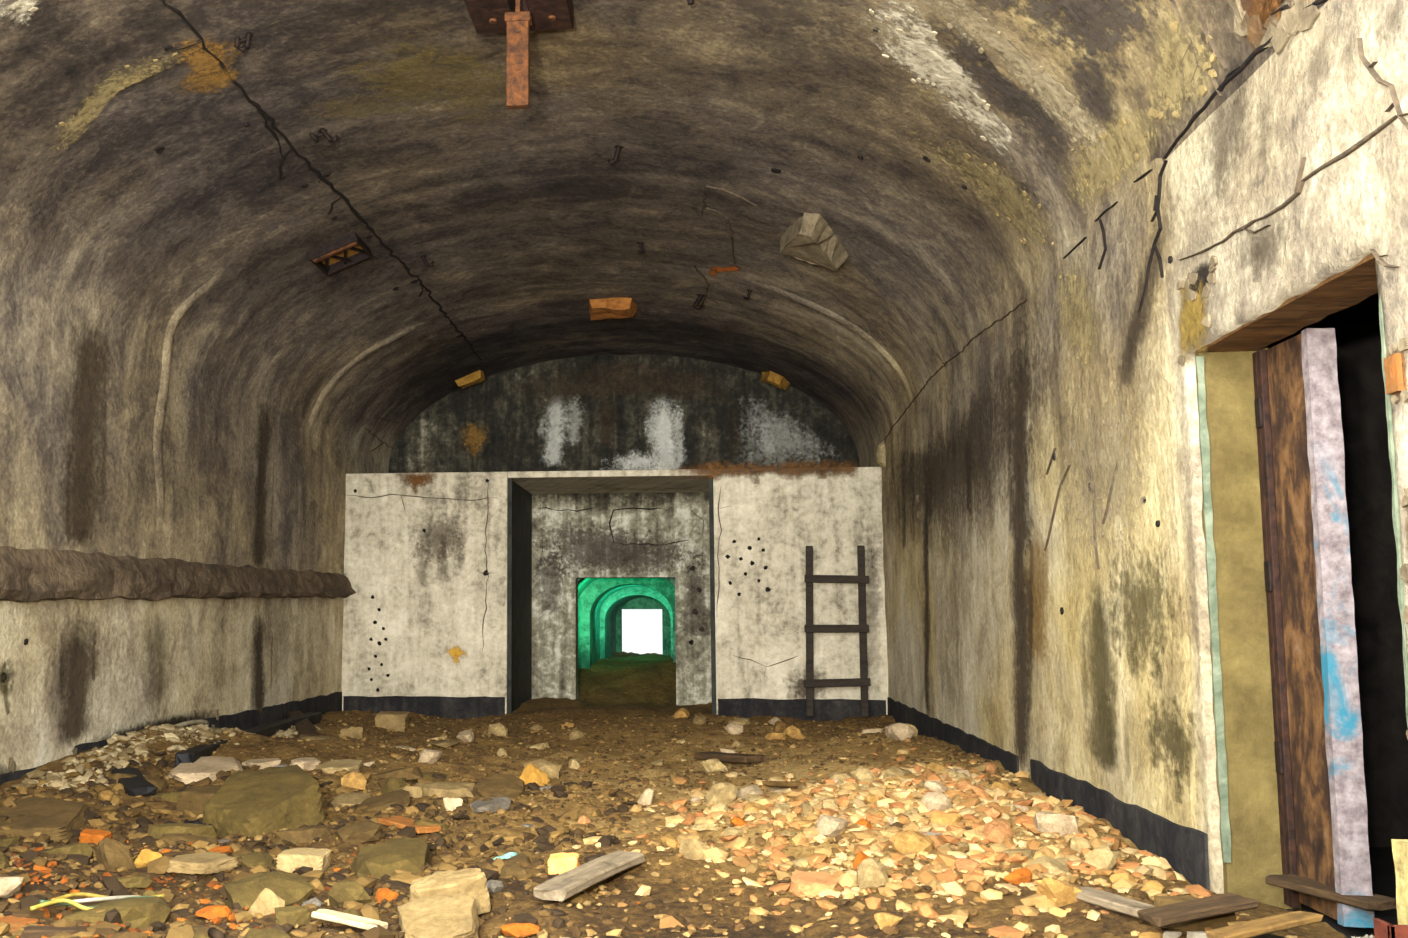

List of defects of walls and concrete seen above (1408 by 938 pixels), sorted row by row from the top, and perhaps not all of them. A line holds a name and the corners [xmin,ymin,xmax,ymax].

rust [180,32,253,87]
crack [162,0,481,360]
water stain [976,0,1161,122]
crack [1062,0,1408,313]
spalling [1226,0,1320,54]
water stain [64,329,107,542]
water stain [535,363,711,470]
water stain [883,317,1036,766]
water stain [1089,558,1171,767]
water stain [1147,697,1197,788]